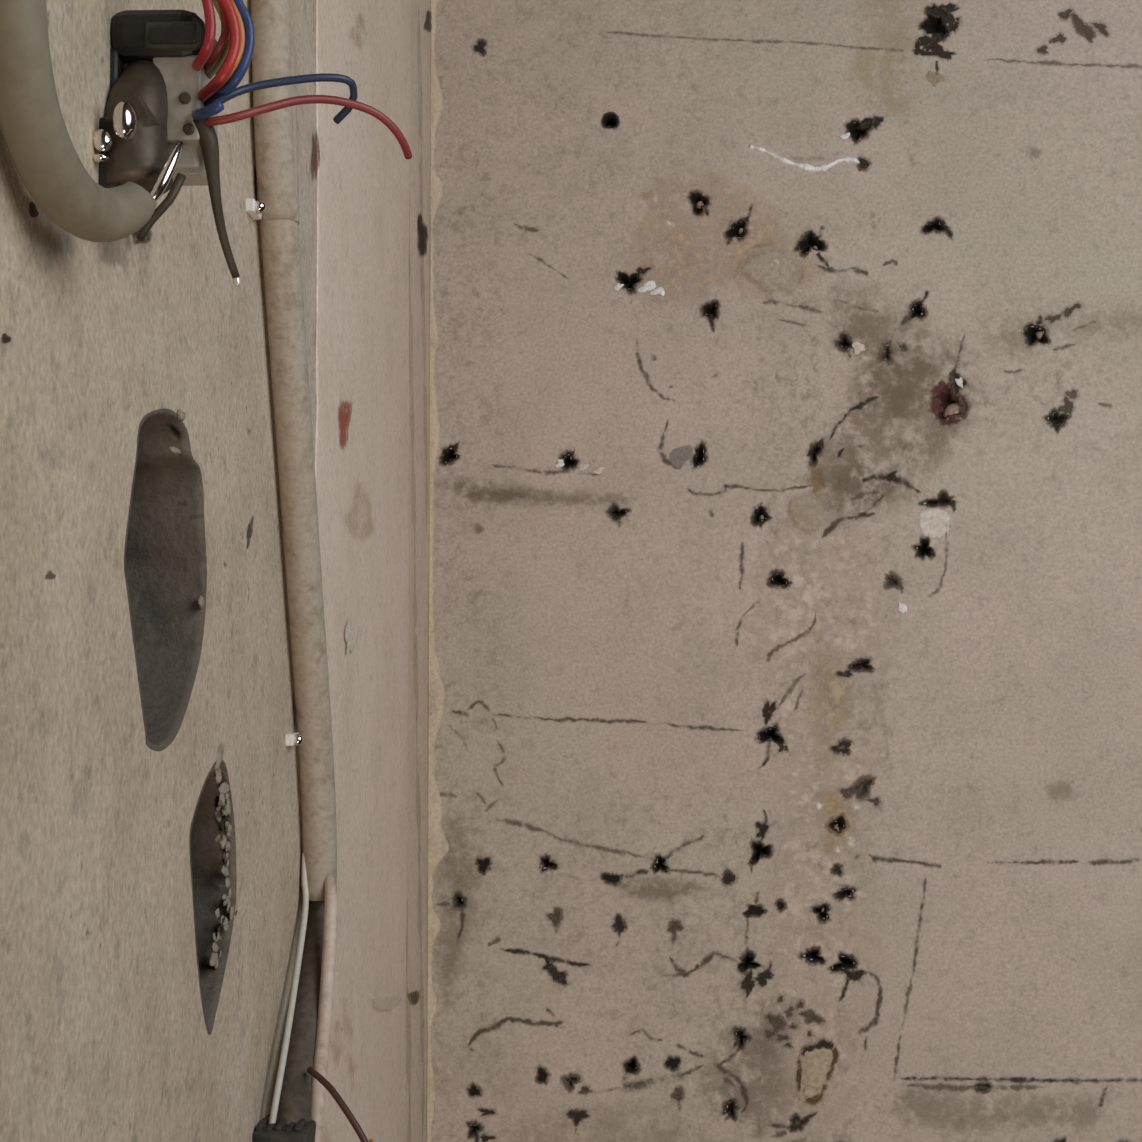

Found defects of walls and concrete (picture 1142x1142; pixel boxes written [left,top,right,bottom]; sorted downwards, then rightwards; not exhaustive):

water stain [749,144,859,172]
crack [636,353,807,516]
crack [831,396,877,457]
crack [823,471,920,537]
spalling [124,409,207,751]
crack [440,700,737,877]
spalling [190,743,238,1035]
crack [488,937,589,967]
crack [469,1009,562,1050]
spalling [733,1026,751,1049]
peeling [765,996,839,1137]
crack [860,972,883,1048]